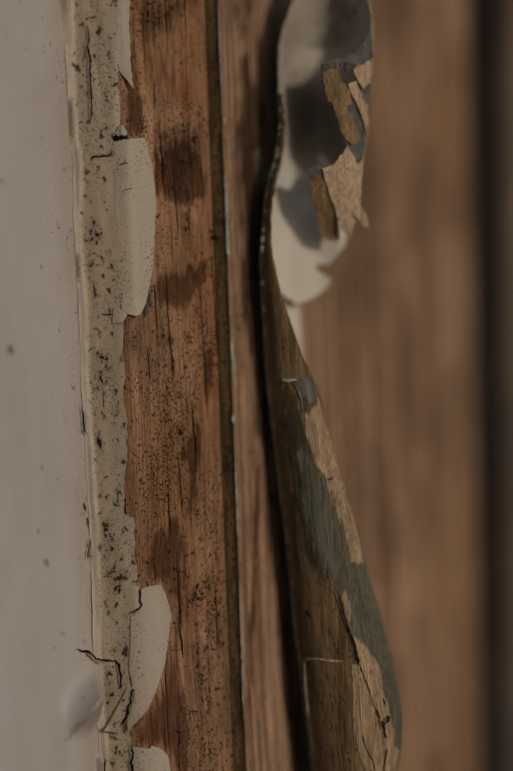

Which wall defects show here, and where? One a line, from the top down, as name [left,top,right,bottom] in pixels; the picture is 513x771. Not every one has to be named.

peeling [113,0,134,89]
peeling [113,124,156,324]
crack [154,264,174,378]
peeling [253,0,403,771]
crack [168,256,217,656]
crack [129,559,156,614]
crack [78,649,135,771]
peeling [104,585,172,733]
peeling [131,746,171,771]
crack [165,672,180,771]